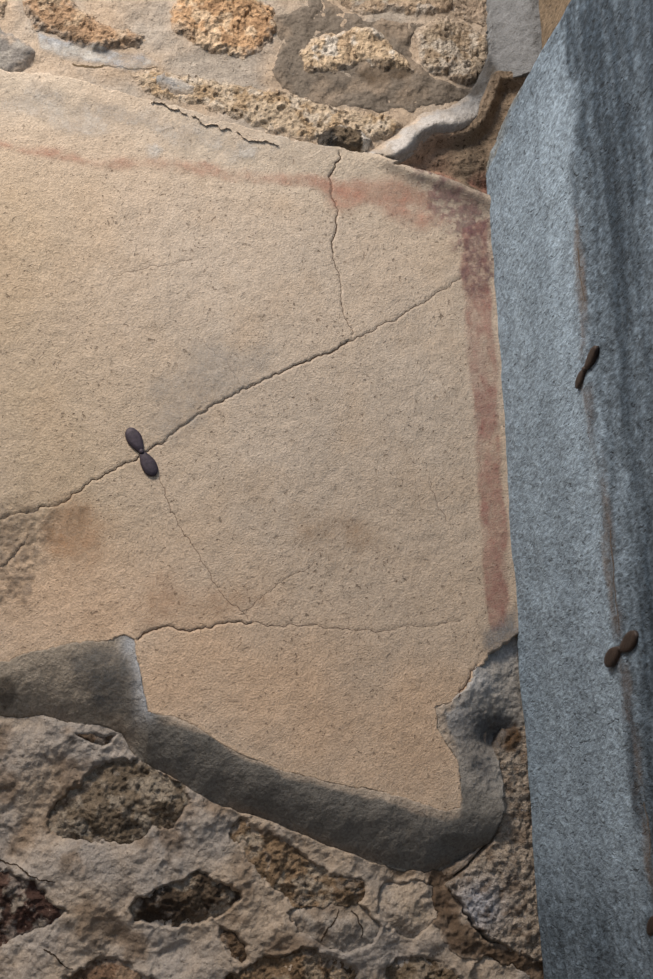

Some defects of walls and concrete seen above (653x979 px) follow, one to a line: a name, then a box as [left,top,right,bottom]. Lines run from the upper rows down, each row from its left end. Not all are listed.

flaking render [0,0,489,153]
crack [1,153,457,519]
crack [138,478,460,640]
flaking render [0,715,544,979]